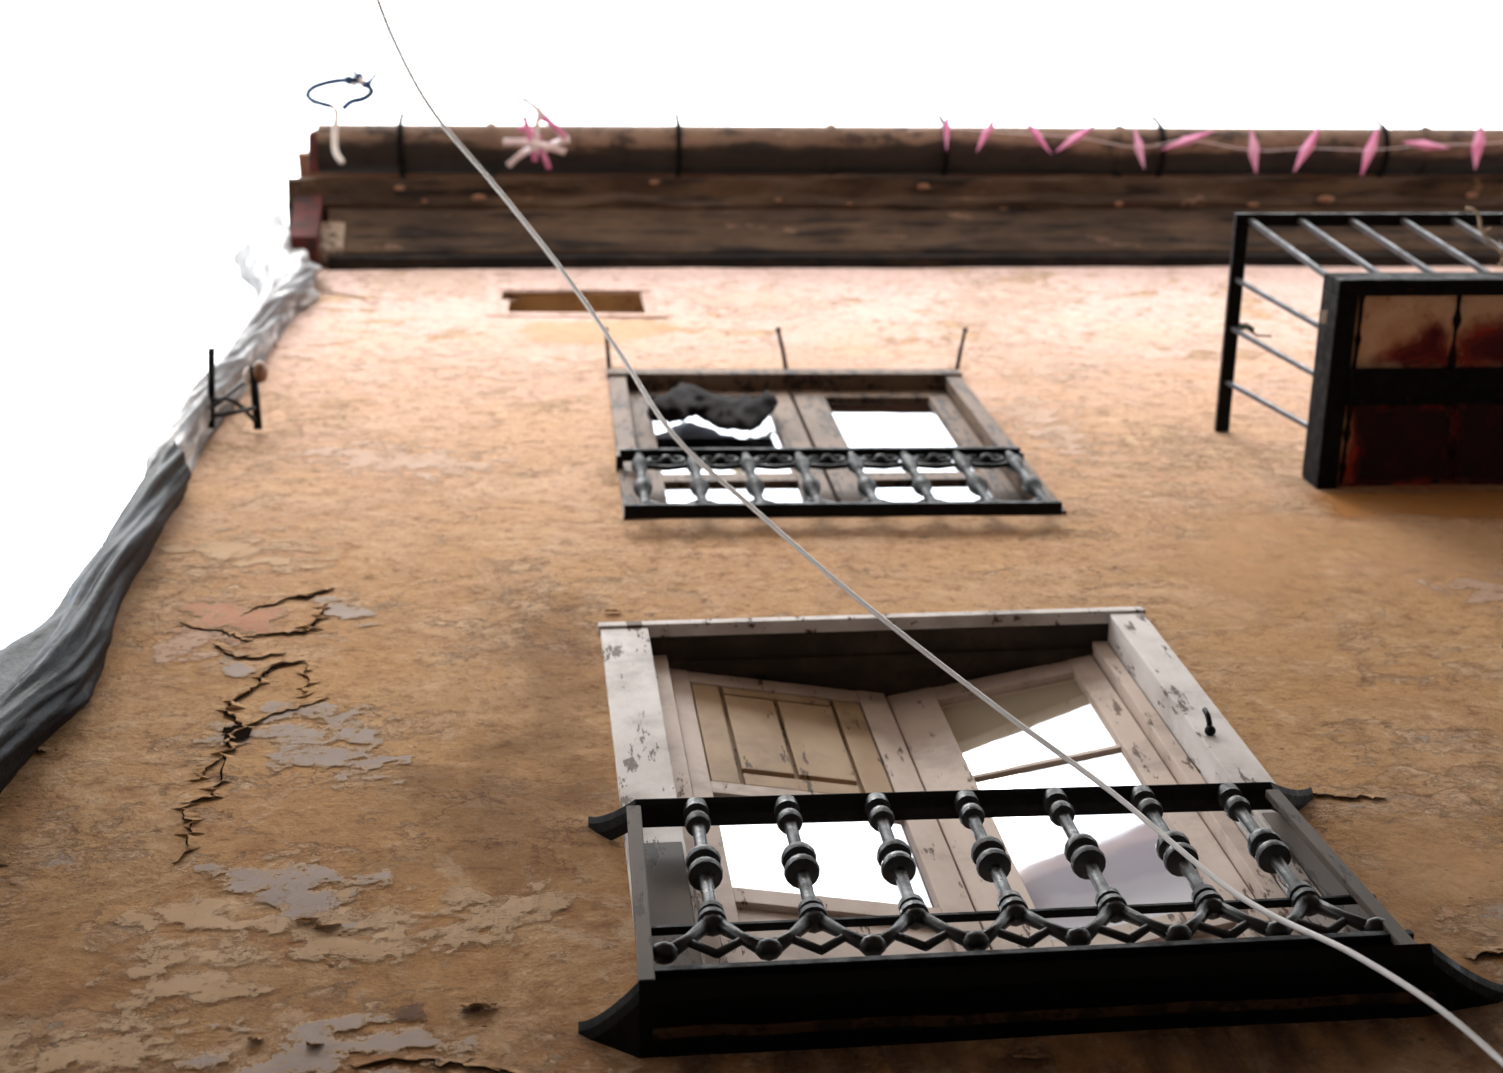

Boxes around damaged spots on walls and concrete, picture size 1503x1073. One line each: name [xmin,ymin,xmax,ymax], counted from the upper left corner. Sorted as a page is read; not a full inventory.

rust [1376,322,1503,368]
rust [1342,405,1503,487]
peeling [141,527,339,575]
flaking render [151,595,296,678]
peeling [310,594,380,631]
crack [169,587,335,863]
peeling [192,700,412,790]
crack [1313,789,1385,800]
peeling [0,852,587,1073]
crack [349,1051,557,1073]